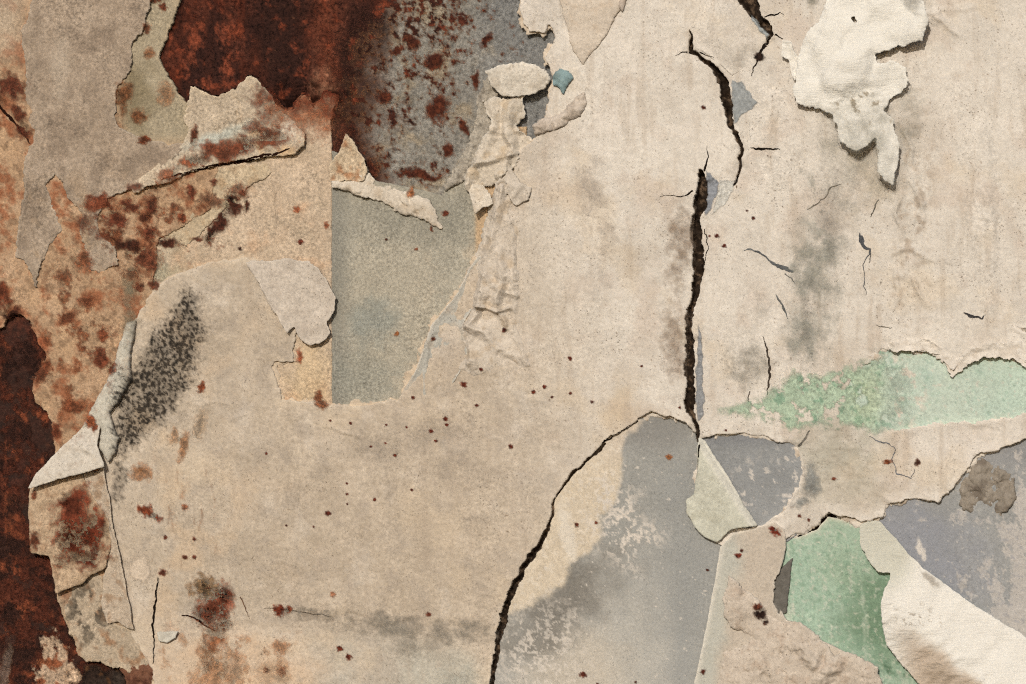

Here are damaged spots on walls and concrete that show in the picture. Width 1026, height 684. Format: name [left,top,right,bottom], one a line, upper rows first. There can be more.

corrosion [79,183,186,292]
leakage [111,291,204,451]
corrosion [187,179,249,246]
corrosion [144,0,492,197]
peeling [153,95,495,405]
crack [660,149,709,457]
crack [675,0,784,186]
peeling [781,0,929,185]
corrosion [0,328,125,684]
crack [490,421,638,684]
peeling [494,329,803,684]
peeling [849,439,1026,684]